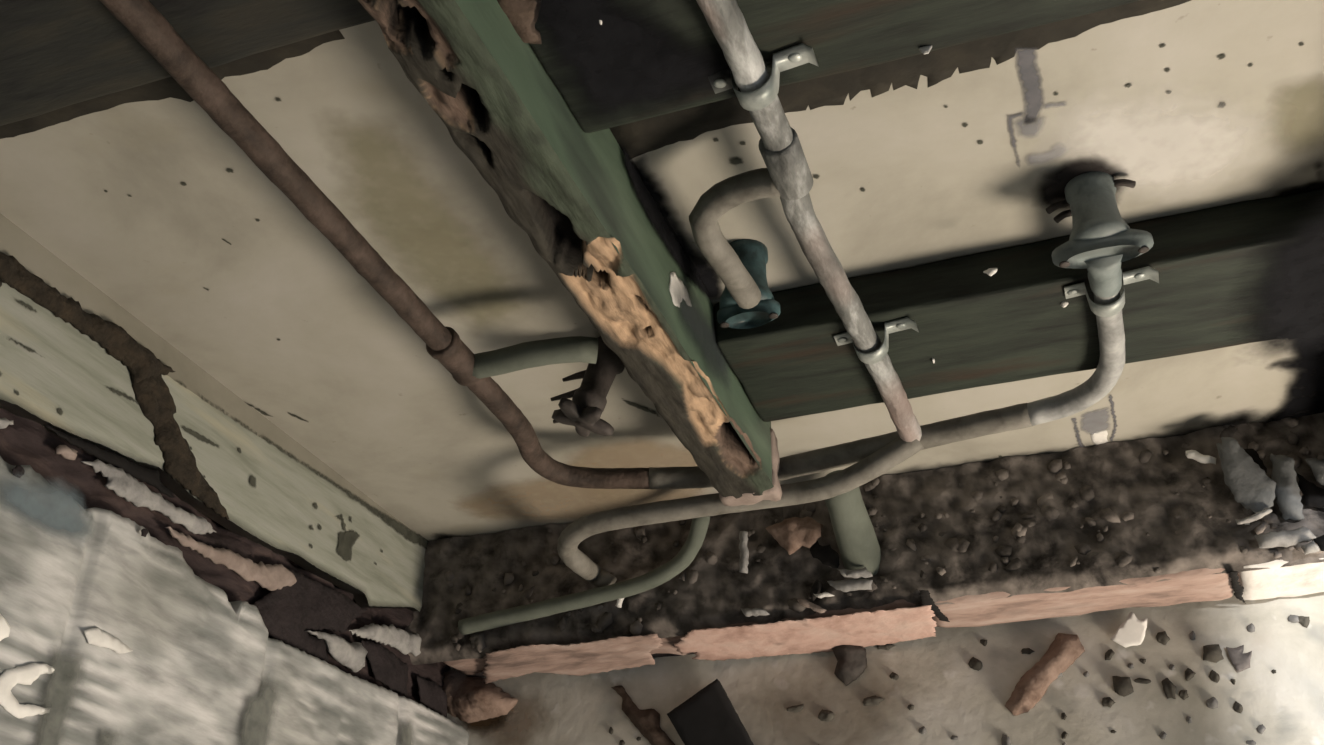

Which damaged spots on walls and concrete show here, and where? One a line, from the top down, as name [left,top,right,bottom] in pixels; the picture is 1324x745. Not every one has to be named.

peeling [777,0,1191,113]
peeling [609,97,753,159]
flaking render [0,418,13,429]
flaking render [55,445,297,591]
peeling [0,614,11,641]
peeling [84,627,133,654]
flaking render [304,623,422,672]
peeling [0,663,54,718]